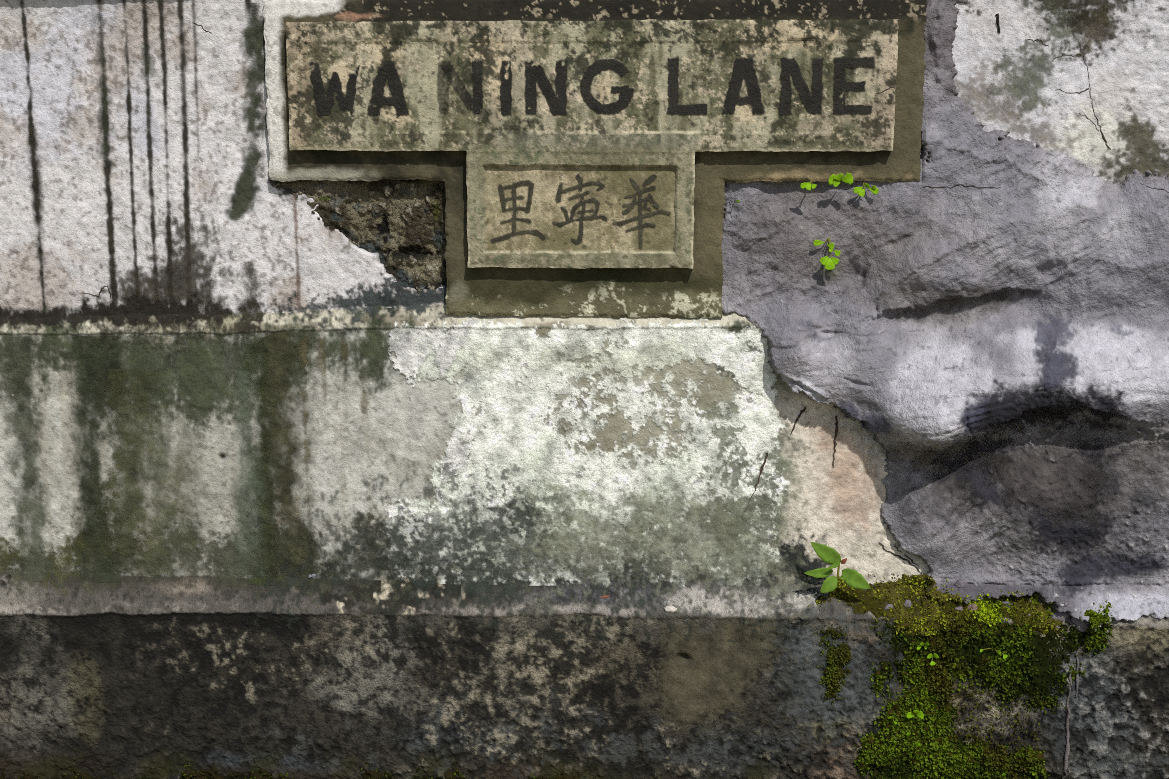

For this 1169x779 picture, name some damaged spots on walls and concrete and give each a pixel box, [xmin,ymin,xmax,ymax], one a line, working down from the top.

damp [958,0,1135,146]
crack [1025,39,1111,150]
damp [1092,108,1169,184]
flaking render [268,176,447,293]
damp [0,0,832,640]
damp [847,252,868,277]
damp [934,316,1164,595]